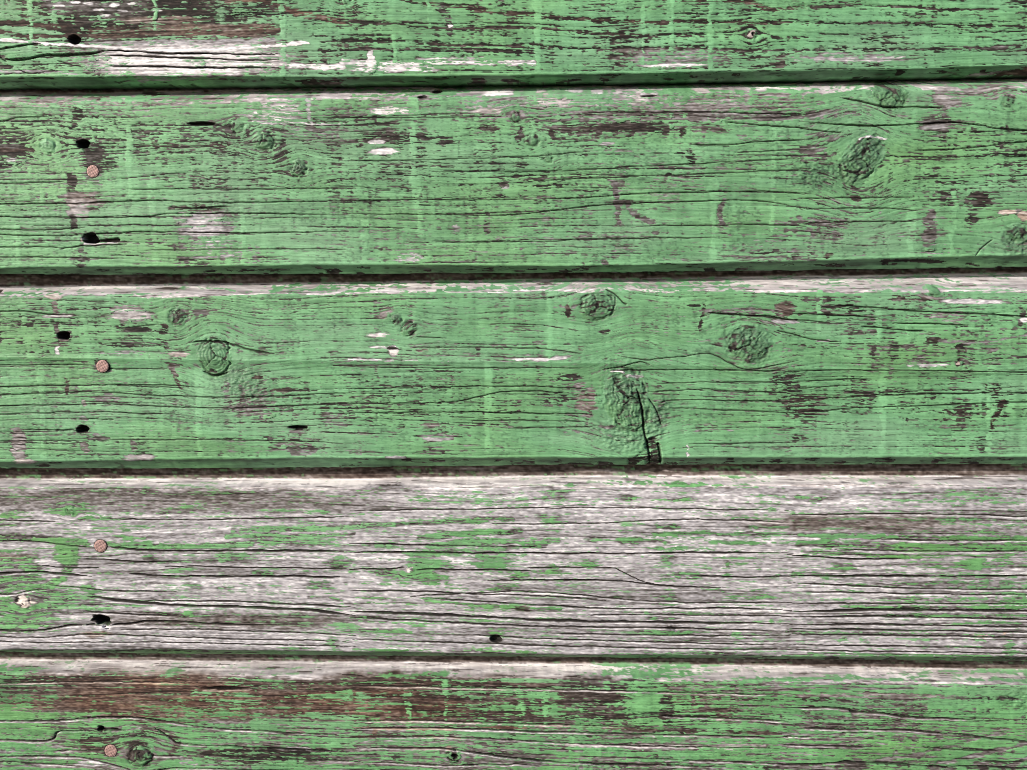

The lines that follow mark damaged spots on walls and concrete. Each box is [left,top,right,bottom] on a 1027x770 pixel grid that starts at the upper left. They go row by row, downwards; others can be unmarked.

peeling [33,0,294,81]
peeling [138,121,221,149]
peeling [359,129,413,145]
peeling [516,96,789,134]
peeling [917,114,954,135]
peeling [0,139,30,173]
peeling [175,208,232,237]
peeling [819,297,863,320]
peeling [263,424,322,453]
crack [627,394,663,464]
peeling [558,687,627,725]
peeling [70,725,337,765]